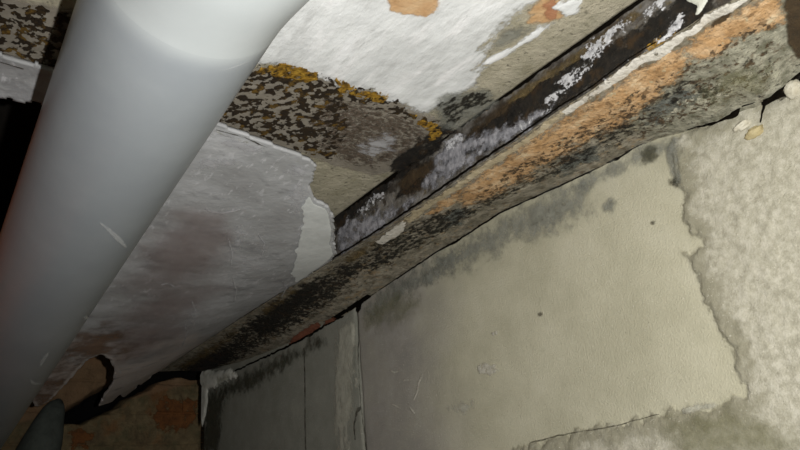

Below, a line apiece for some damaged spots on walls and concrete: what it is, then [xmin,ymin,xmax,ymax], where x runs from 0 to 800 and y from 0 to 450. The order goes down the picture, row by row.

mould [0,0,73,68]
damp [220,0,714,234]
corrosion [425,0,786,215]
crack [687,72,800,130]
crack [233,312,359,449]
spalling [289,294,371,344]
damp [174,41,775,450]
crack [371,143,644,296]